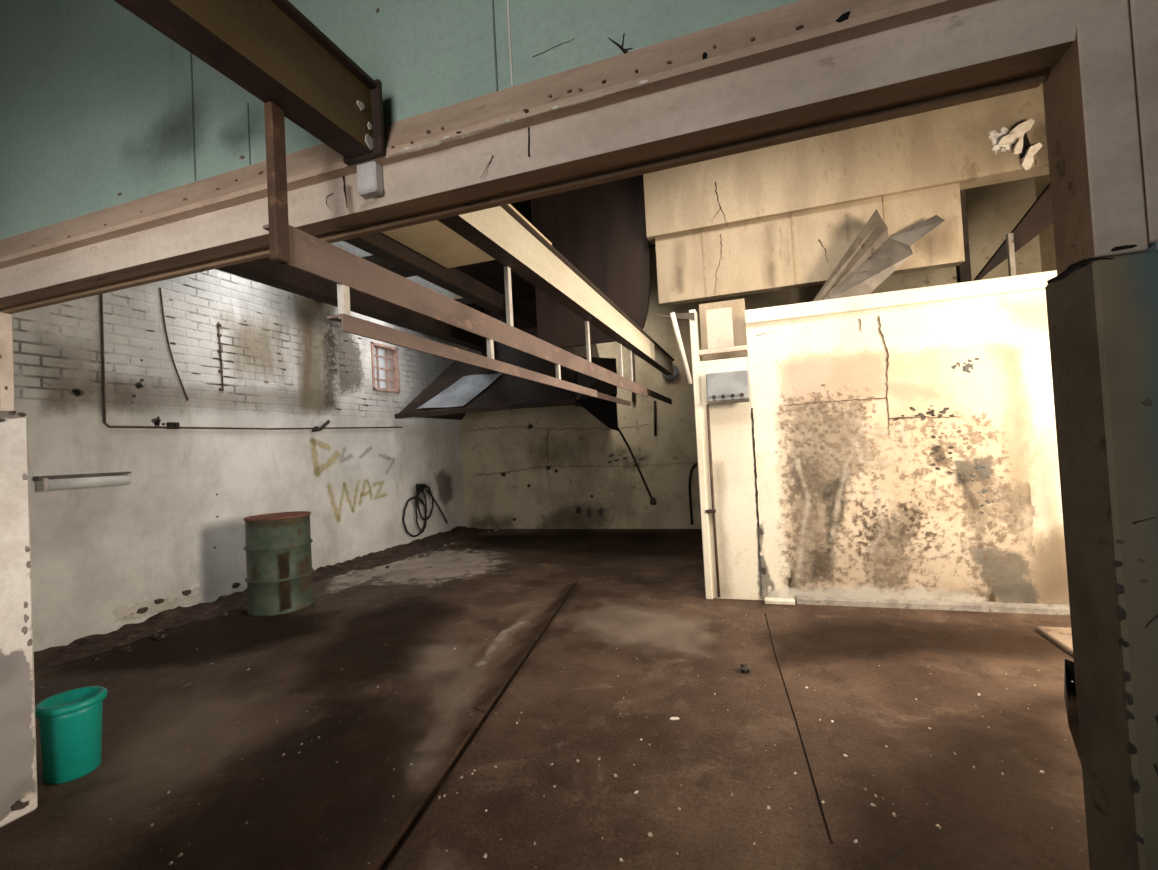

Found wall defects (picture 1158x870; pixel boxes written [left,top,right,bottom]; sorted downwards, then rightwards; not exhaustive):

peeling [988,127,1010,154]
leakage [298,298,361,408]
crack [791,316,958,435]
leakage [768,584,1004,602]
leakage [1026,539,1069,605]
spalling [0,601,36,821]